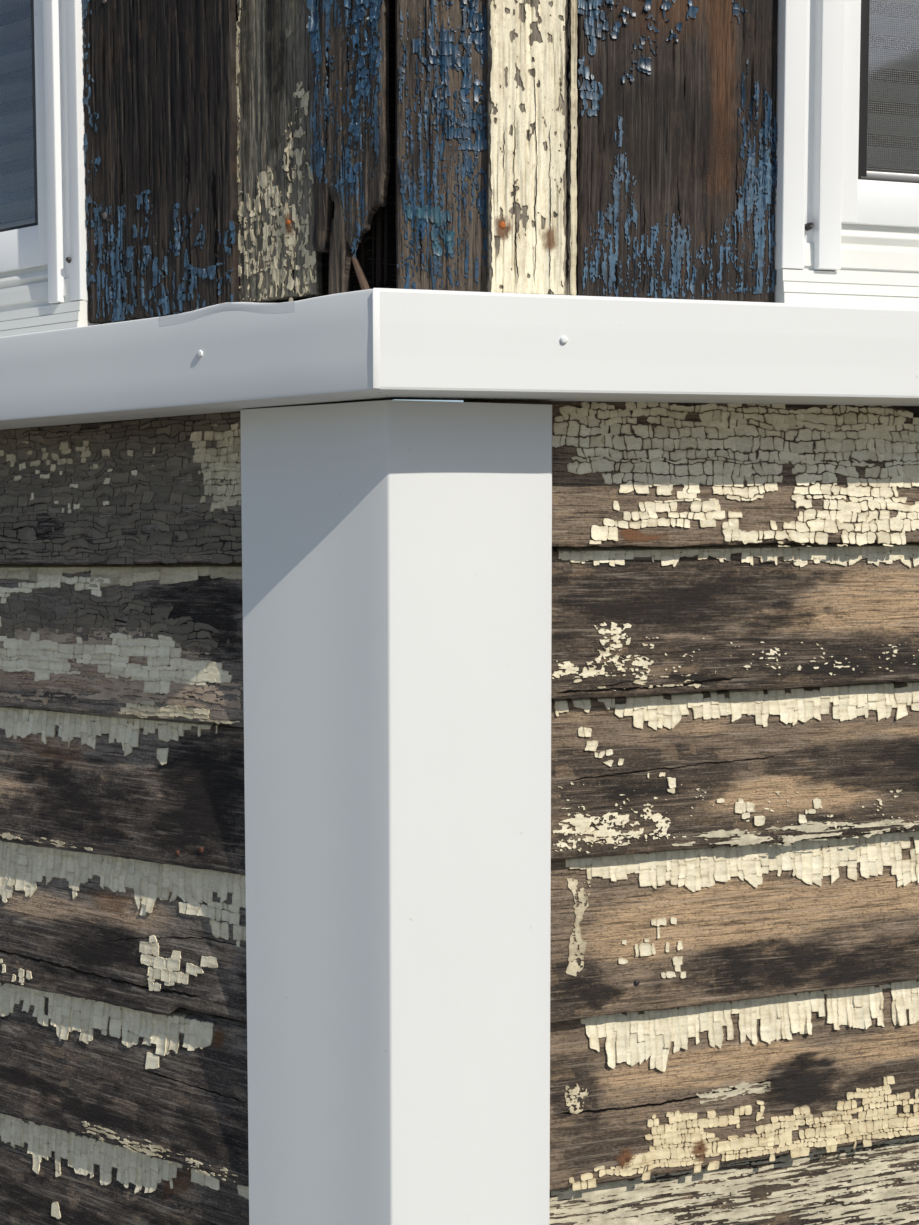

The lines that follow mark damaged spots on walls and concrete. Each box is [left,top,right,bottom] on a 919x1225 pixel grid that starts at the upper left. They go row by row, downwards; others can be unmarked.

peeling [82,0,383,323]
rust [496,218,511,239]
peeling [397,0,778,299]
peeling [552,402,919,568]
peeling [0,411,243,765]
peeling [552,622,919,767]
peeling [0,833,246,947]
peeling [553,772,919,979]
peeling [0,959,214,1069]
peeling [580,980,919,1072]
peeling [0,1113,249,1200]
peeling [550,1076,919,1225]